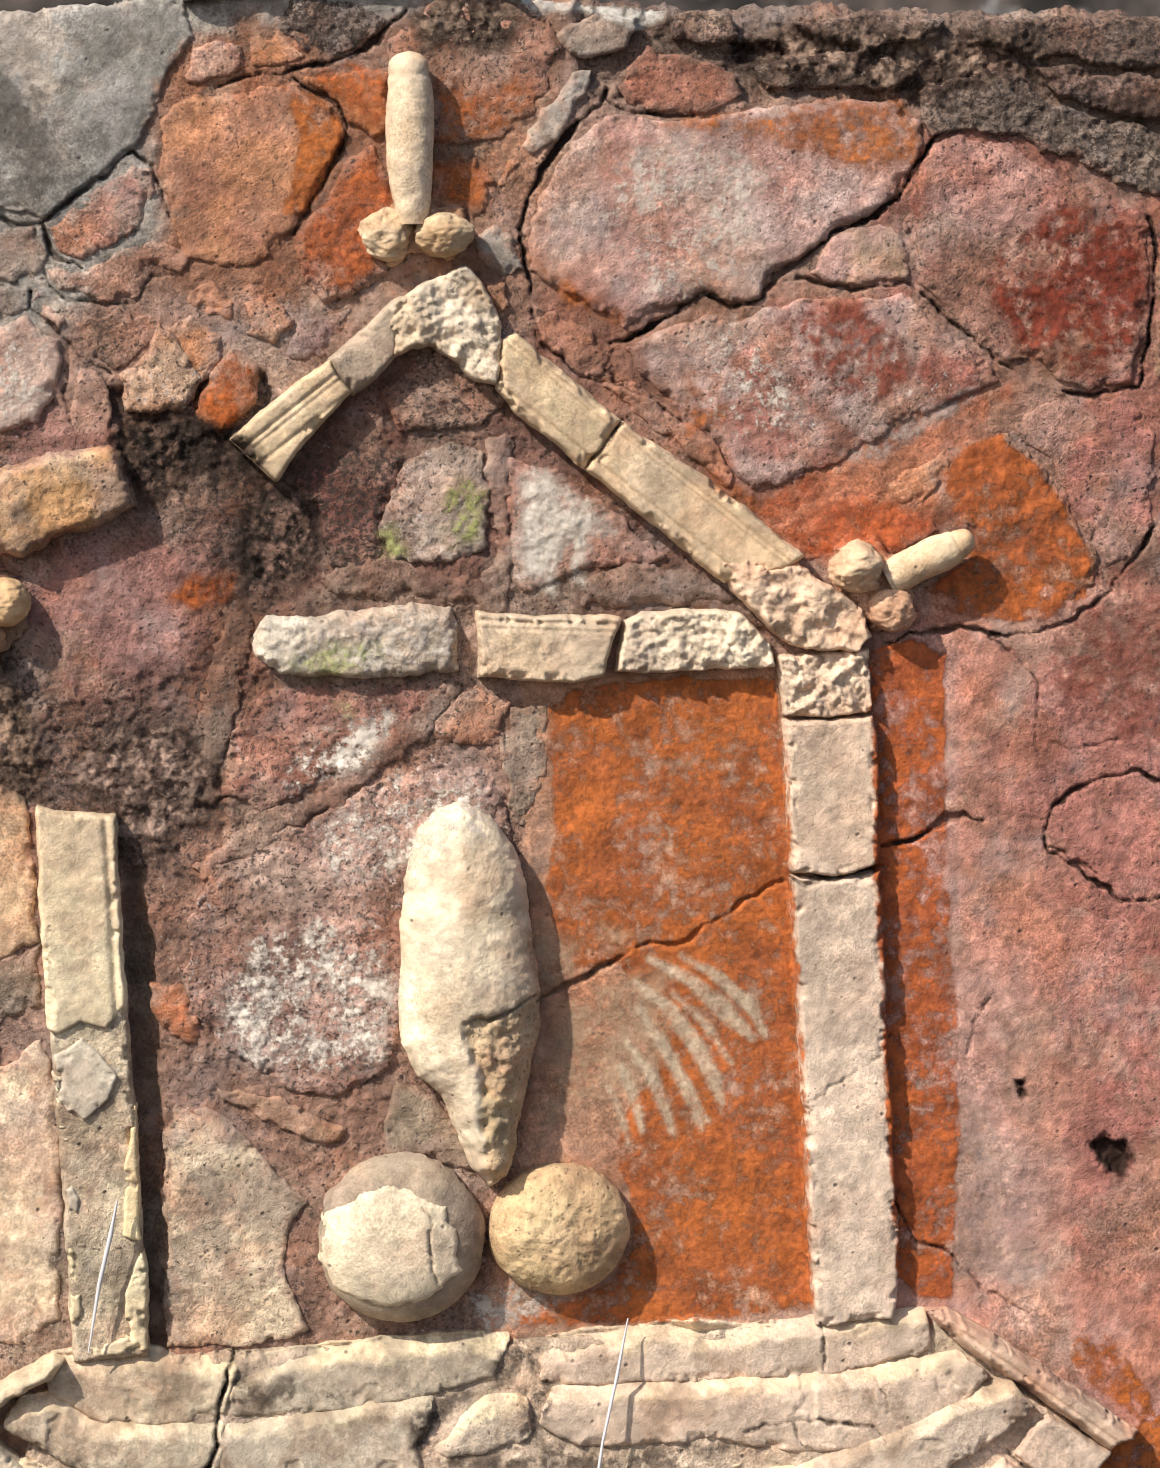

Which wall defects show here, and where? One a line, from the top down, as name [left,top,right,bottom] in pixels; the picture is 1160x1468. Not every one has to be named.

crack [1140,769,1160,782]
crack [791,831,927,881]
crack [1043,784,1160,903]
crack [585,942,663,977]